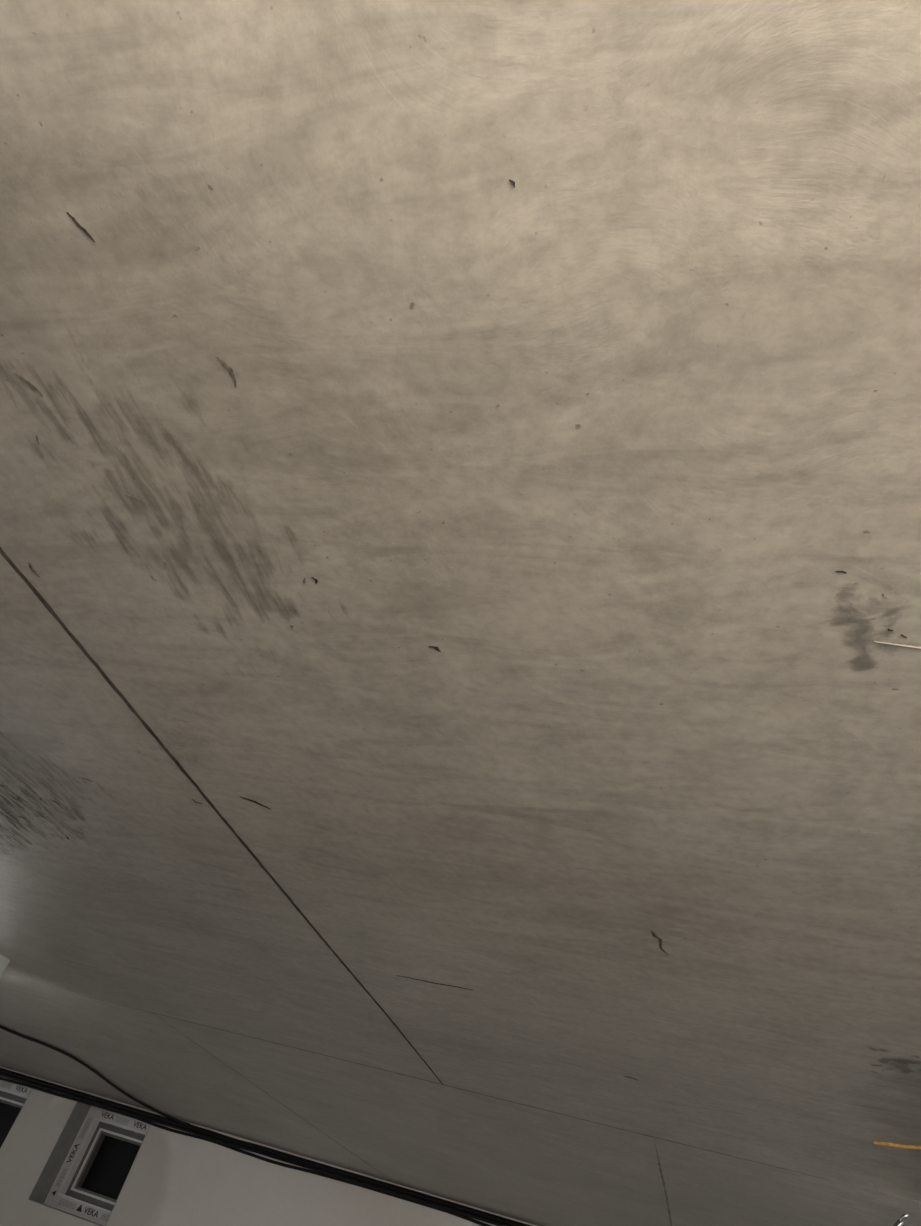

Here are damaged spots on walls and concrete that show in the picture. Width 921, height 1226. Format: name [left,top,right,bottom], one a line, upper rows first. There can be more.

leakage [874,1141,921,1149]